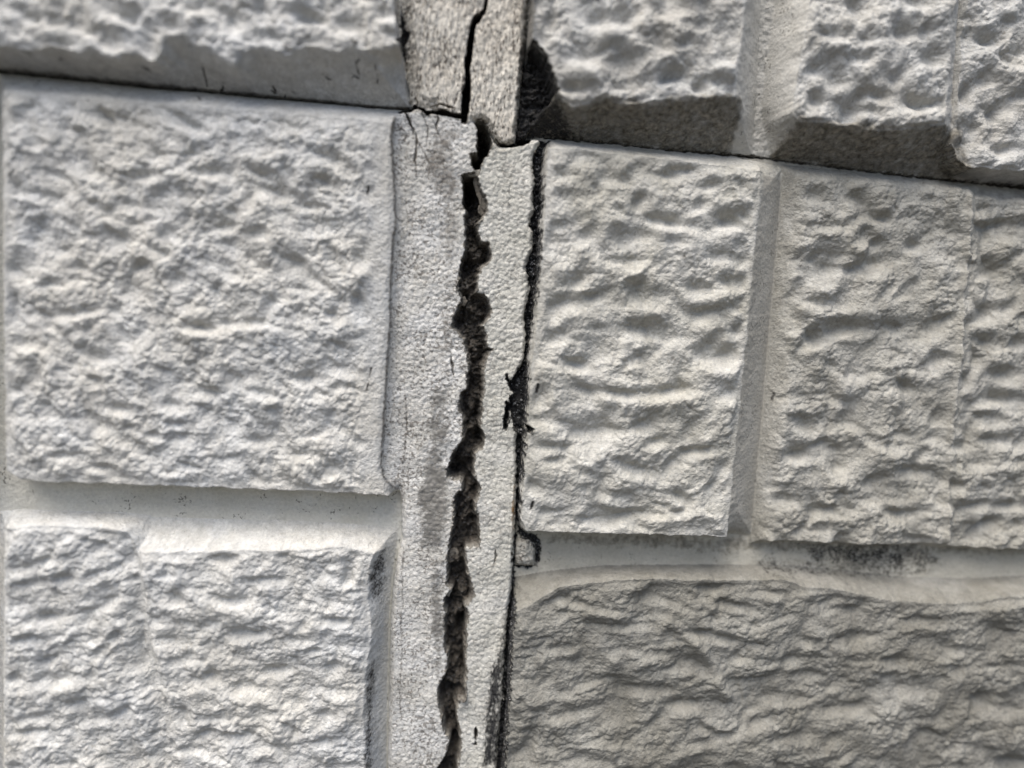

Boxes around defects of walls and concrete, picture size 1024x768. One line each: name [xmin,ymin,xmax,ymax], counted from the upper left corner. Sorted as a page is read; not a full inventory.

crack [391,0,531,768]